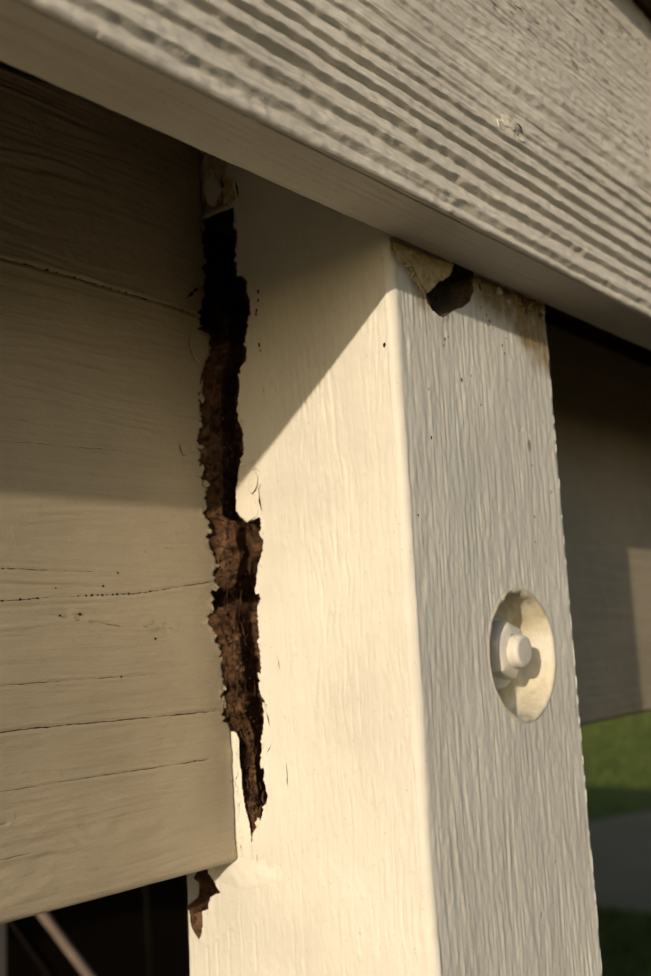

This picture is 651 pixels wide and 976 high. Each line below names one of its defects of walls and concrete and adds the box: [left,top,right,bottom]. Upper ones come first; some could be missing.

peeling [199,150,237,214]
spalling [393,241,546,318]